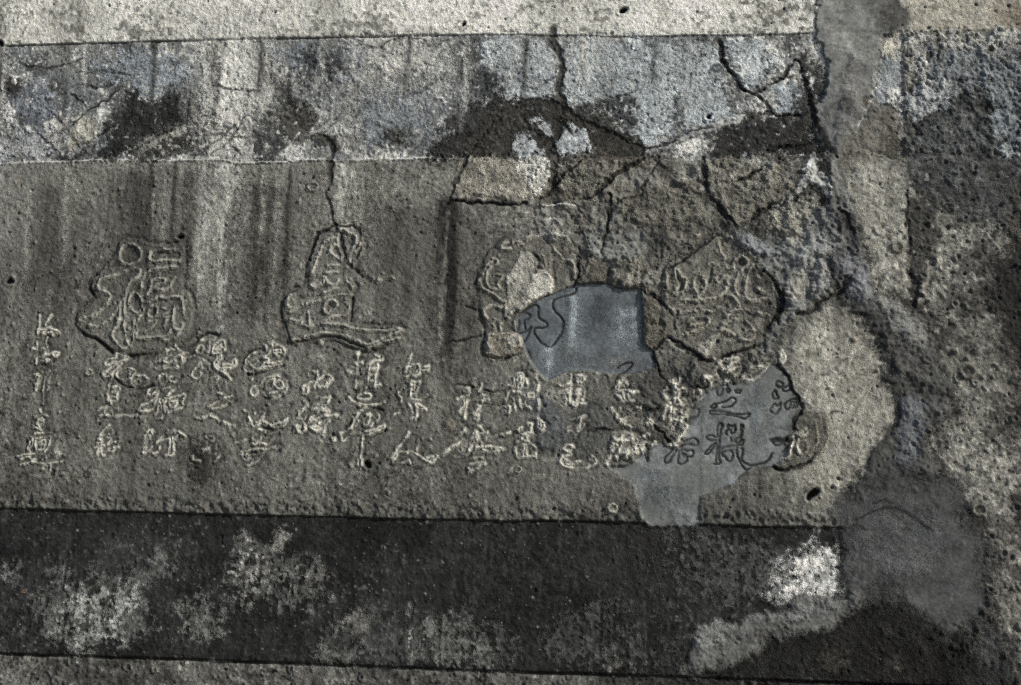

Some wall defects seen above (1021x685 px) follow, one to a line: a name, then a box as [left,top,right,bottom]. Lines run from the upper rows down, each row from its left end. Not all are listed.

crack [204,84,260,152]
crack [309,112,368,279]
water stain [23,6,671,331]
water stain [427,199,458,375]
crack [447,26,707,282]
crack [668,157,775,269]
crack [641,268,851,375]
crack [718,43,838,182]
crack [770,364,803,442]
crack [768,456,814,472]
water stain [662,48,1021,685]
crack [837,207,855,236]